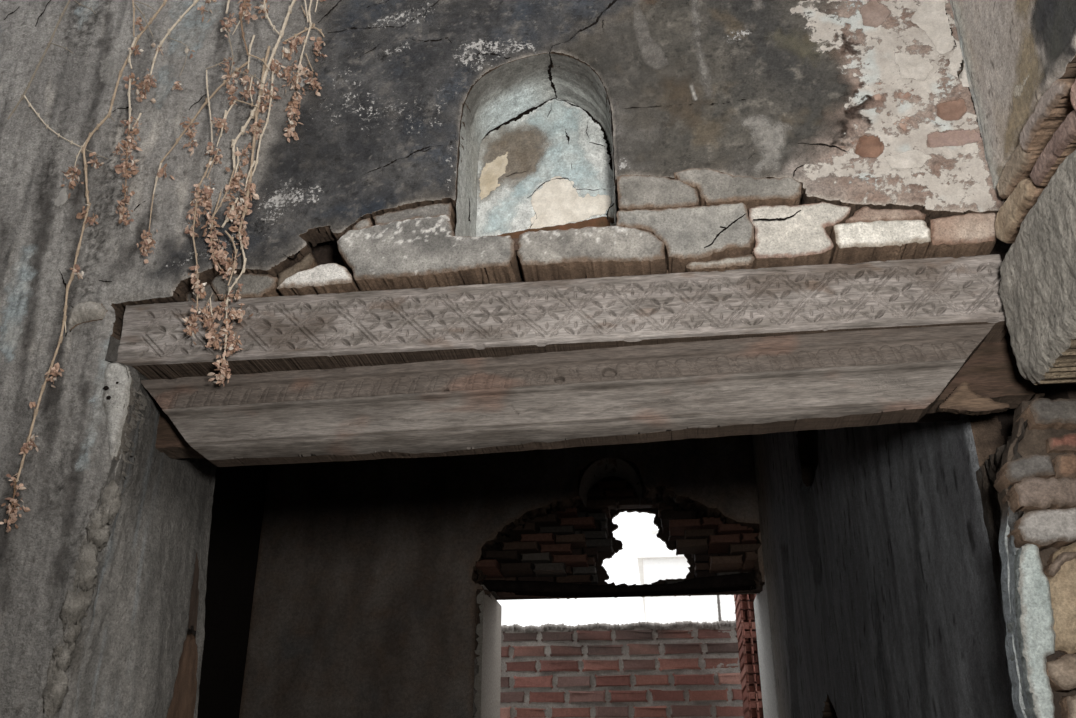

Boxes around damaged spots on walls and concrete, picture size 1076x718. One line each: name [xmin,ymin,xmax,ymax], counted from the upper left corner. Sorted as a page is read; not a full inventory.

crack [318,0,511,61]
water stain [311,65,446,136]
water stain [454,39,539,94]
crack [482,0,617,232]
crack [945,8,985,147]
crack [364,141,456,175]
peeling [479,151,508,200]
peeling [497,176,618,238]
peeling [790,0,1076,385]